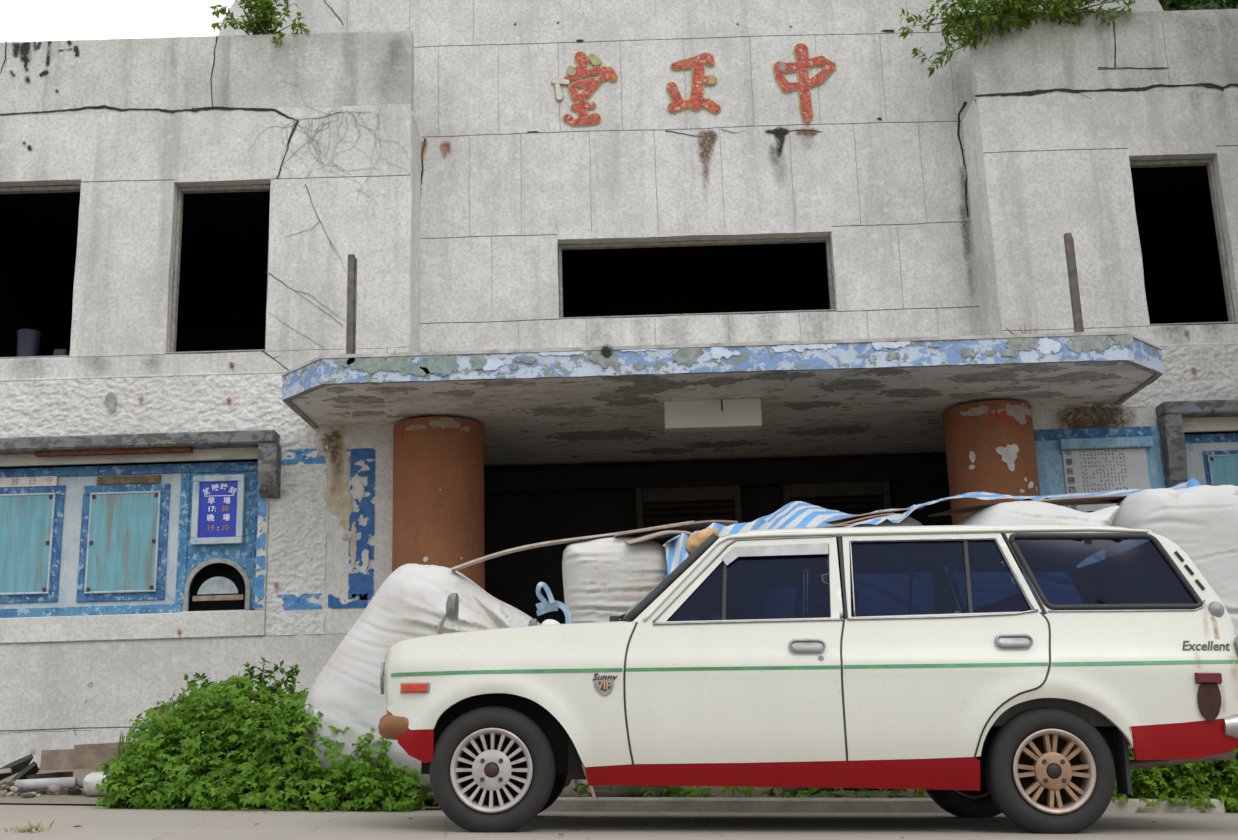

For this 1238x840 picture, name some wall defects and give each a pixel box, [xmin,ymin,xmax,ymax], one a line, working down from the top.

leakage [10,40,79,82]
crack [0,36,370,272]
leakage [699,131,716,177]
leakage [765,127,789,155]
crack [957,20,1238,217]
peeling [311,335,1133,574]